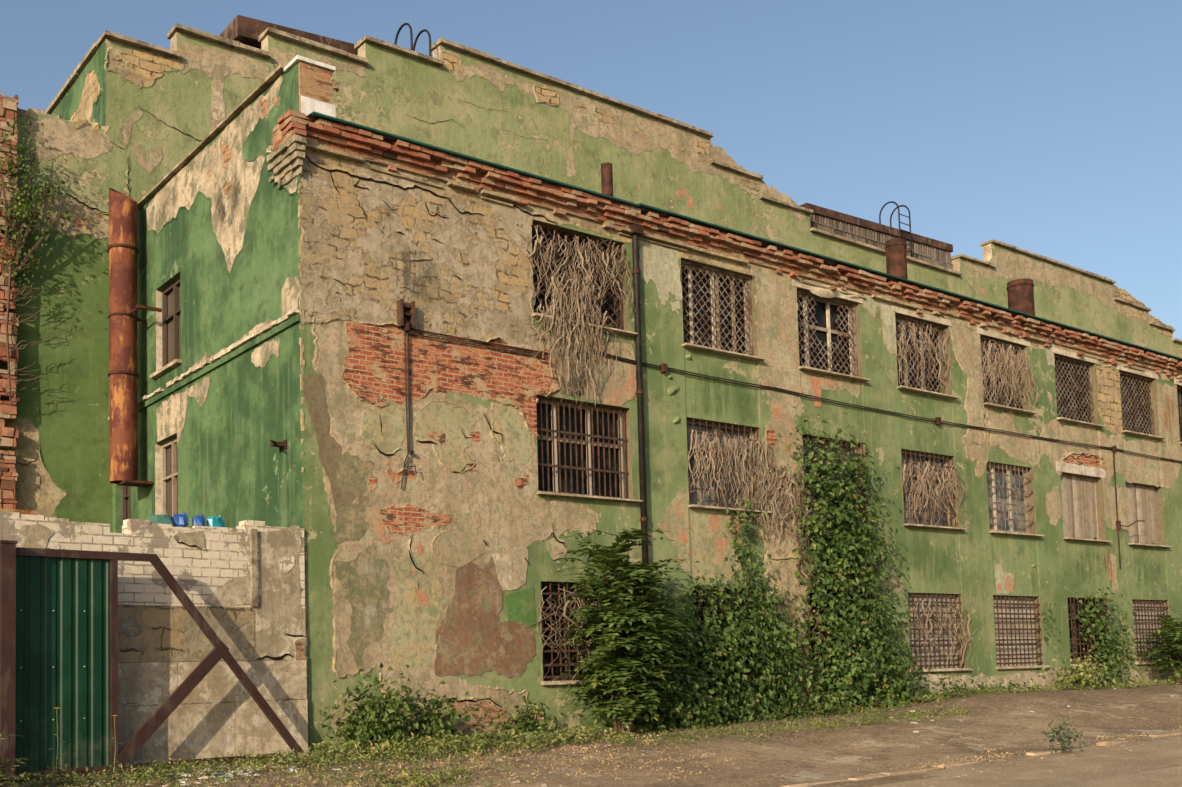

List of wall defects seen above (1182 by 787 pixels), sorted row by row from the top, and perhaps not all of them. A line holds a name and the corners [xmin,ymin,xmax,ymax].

peeling [315,59,366,92]
peeling [18,40,296,276]
peeling [440,50,806,221]
peeling [0,417,69,518]
peeling [156,377,210,446]
crack [374,413,505,473]
flaking render [188,149,1182,741]